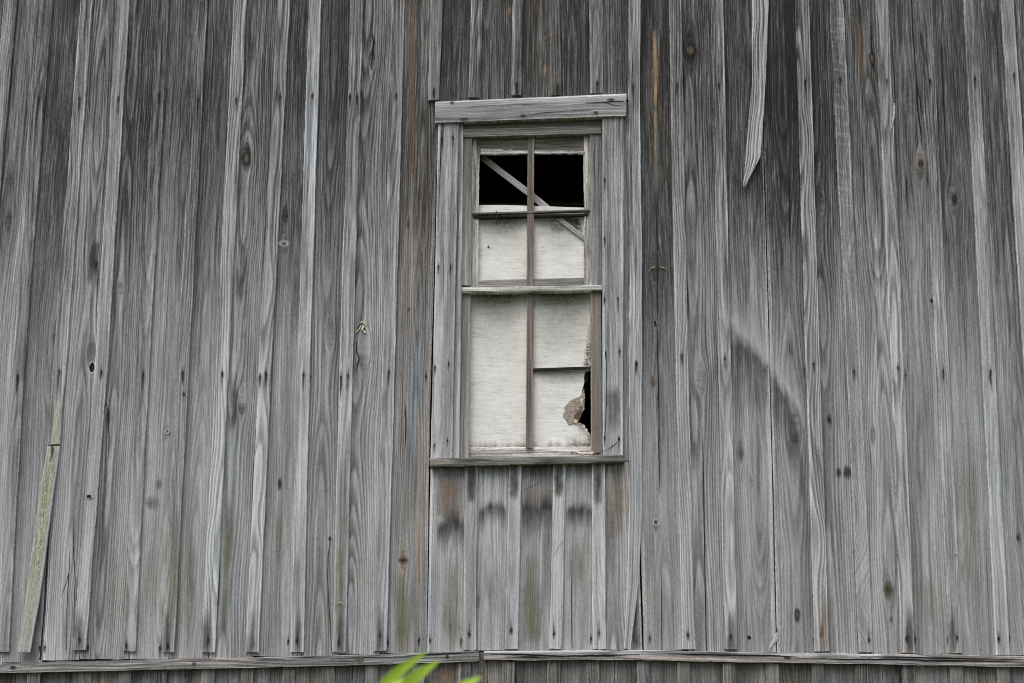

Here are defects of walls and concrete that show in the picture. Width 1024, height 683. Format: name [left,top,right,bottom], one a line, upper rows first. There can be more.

leakage [498,464,563,523]
leakage [577,464,601,499]
leakage [439,516,462,535]
leakage [568,506,591,519]